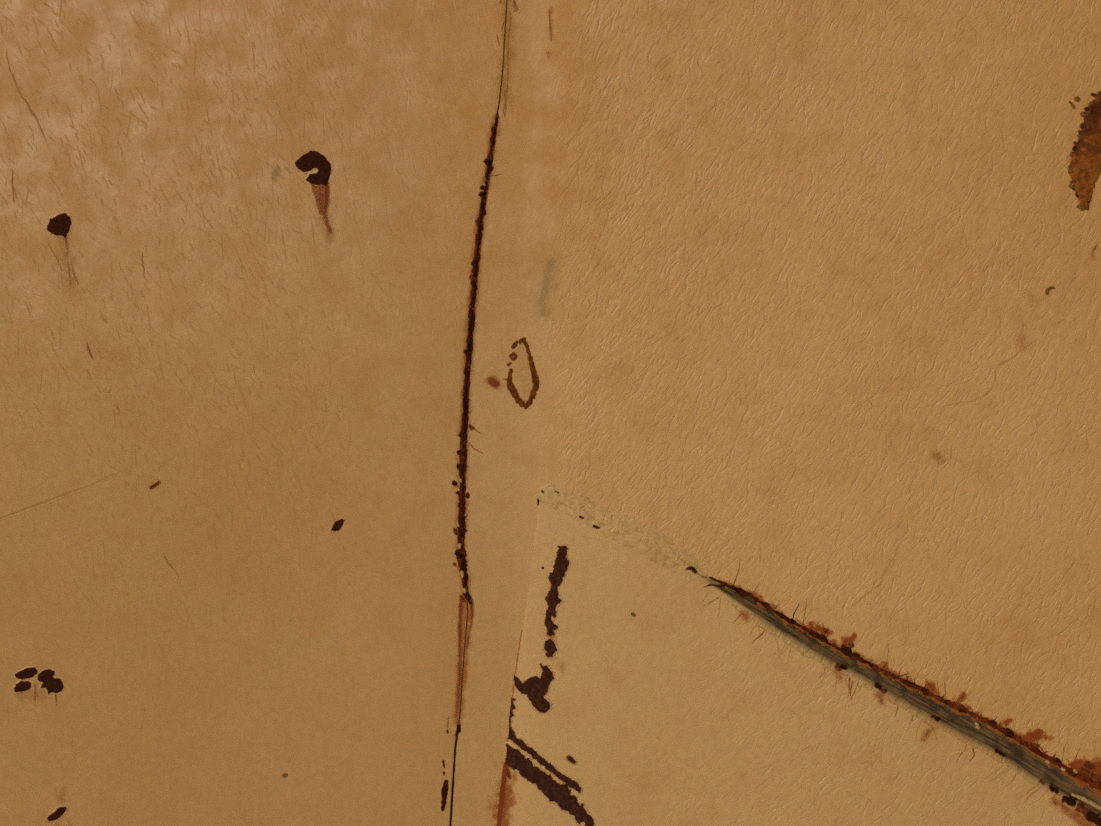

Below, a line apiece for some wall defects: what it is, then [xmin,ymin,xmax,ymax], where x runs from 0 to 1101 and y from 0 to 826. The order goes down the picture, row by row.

rust [1068,91,1101,211]
rust [455,113,499,724]
rust [488,337,540,410]
rust [685,563,1101,826]
rust [492,762,516,826]